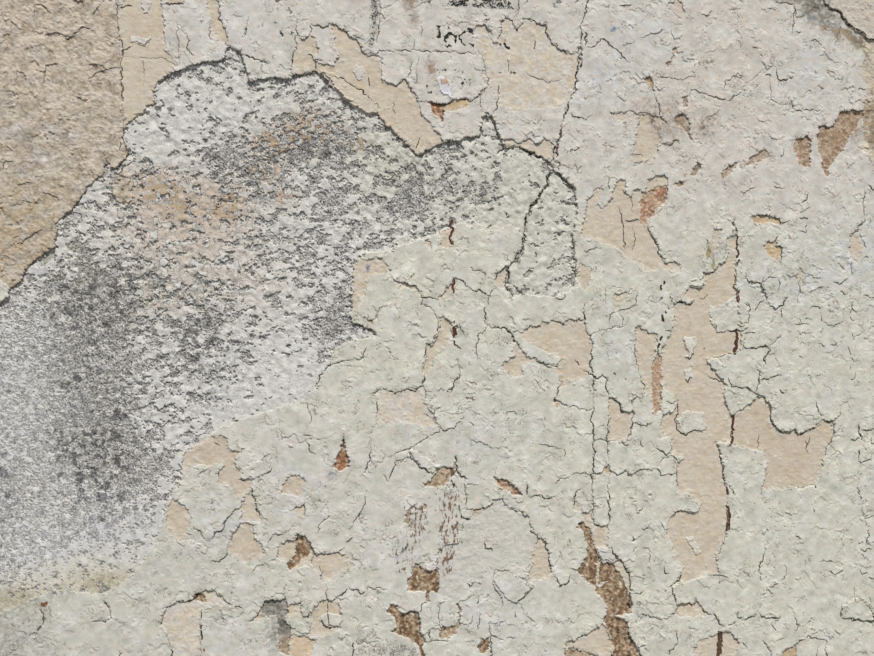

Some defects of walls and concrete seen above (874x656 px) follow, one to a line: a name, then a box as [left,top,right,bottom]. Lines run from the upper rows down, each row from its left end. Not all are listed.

crack [352,13,499,113]
crack [654,65,820,146]
crack [781,2,874,45]
spalling [793,35,874,177]
spalling [0,0,683,613]
crack [345,365,491,520]
crack [420,102,703,520]
peeling [634,215,835,586]
crack [685,263,874,396]
spalling [387,604,426,656]
peeling [407,477,552,639]
spalling [565,497,640,656]